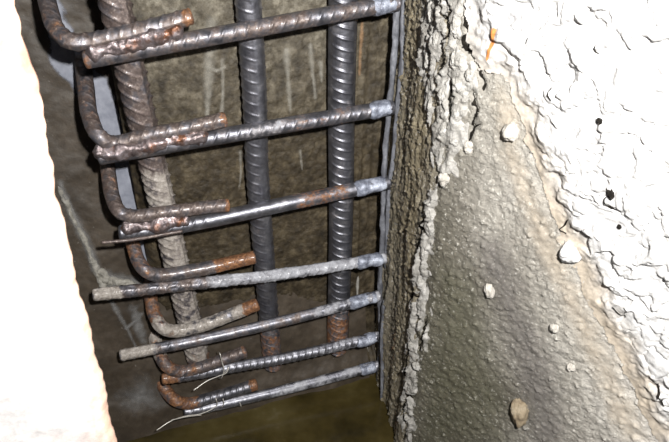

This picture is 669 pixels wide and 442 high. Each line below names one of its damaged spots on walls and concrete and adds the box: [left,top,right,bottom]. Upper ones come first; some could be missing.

spalling [97,0,137,29]
spalling [234,0,263,22]
spalling [113,59,159,132]
spalling [238,36,268,124]
spalling [328,19,358,110]
crack [440,0,492,152]
spalling [136,154,176,207]
spalling [328,122,355,187]
crack [416,218,425,249]
spalling [92,197,387,364]
crack [402,318,427,441]
crack [651,380,664,406]